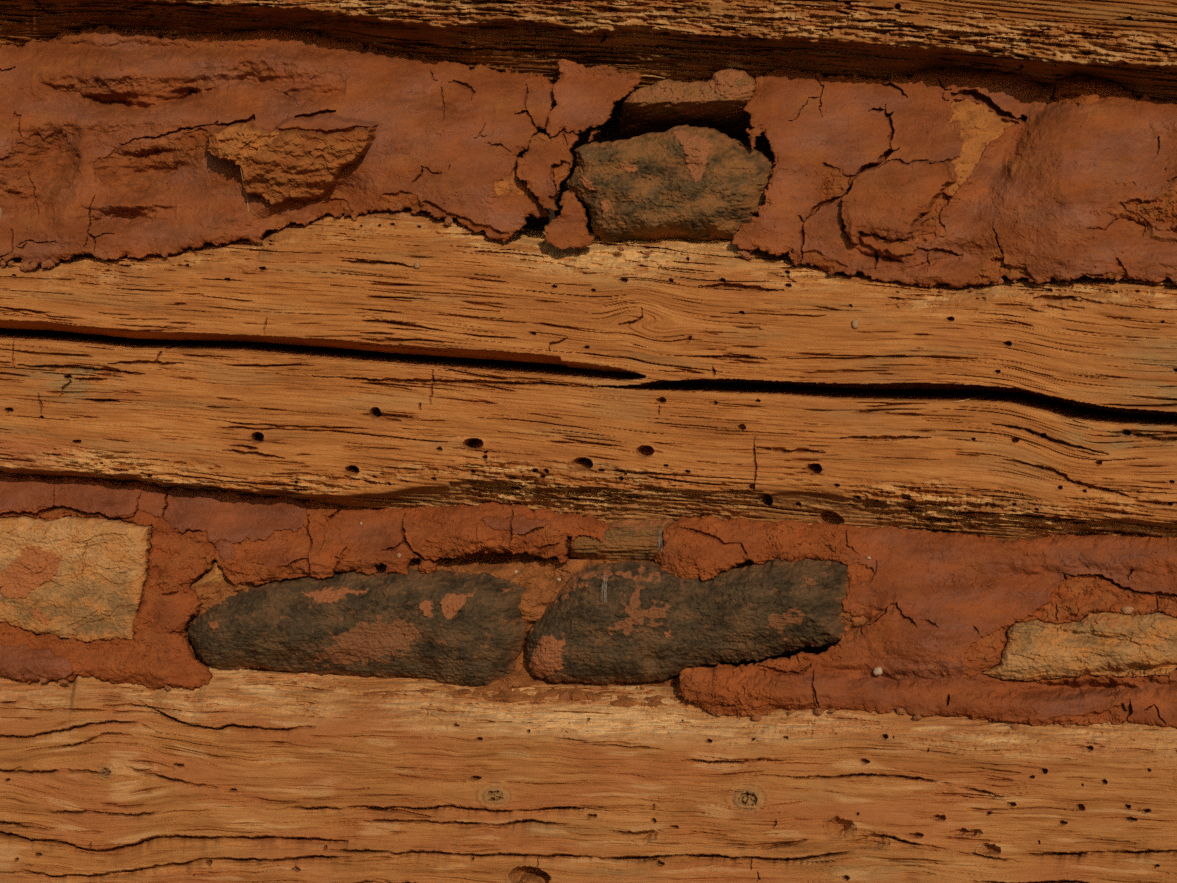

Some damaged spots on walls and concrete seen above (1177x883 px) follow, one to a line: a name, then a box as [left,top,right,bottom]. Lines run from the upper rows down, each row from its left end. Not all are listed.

crack [120,115,256,146]
crack [291,109,336,121]
crack [937,77,1057,123]
spalling [0,122,379,208]
crack [797,83,955,270]
spalling [1122,185,1177,228]
crack [699,282,784,292]
crack [0,318,1177,499]
peeling [0,472,312,545]
crack [1018,514,1074,523]
spalling [224,560,307,584]
spalling [1021,575,1177,622]